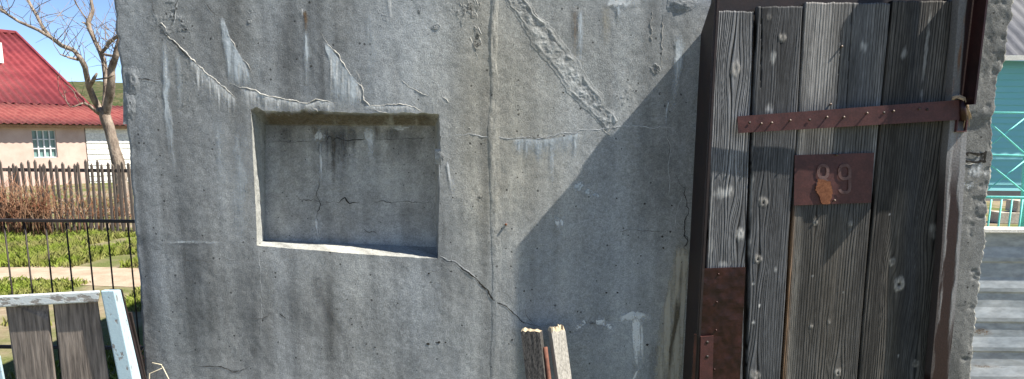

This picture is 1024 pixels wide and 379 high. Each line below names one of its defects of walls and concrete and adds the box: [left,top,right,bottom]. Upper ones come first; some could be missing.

crack [152,0,337,112]
damp [163,19,429,173]
crack [321,33,449,113]
crack [273,125,689,263]
spalling [966,151,987,165]
crack [440,256,542,327]